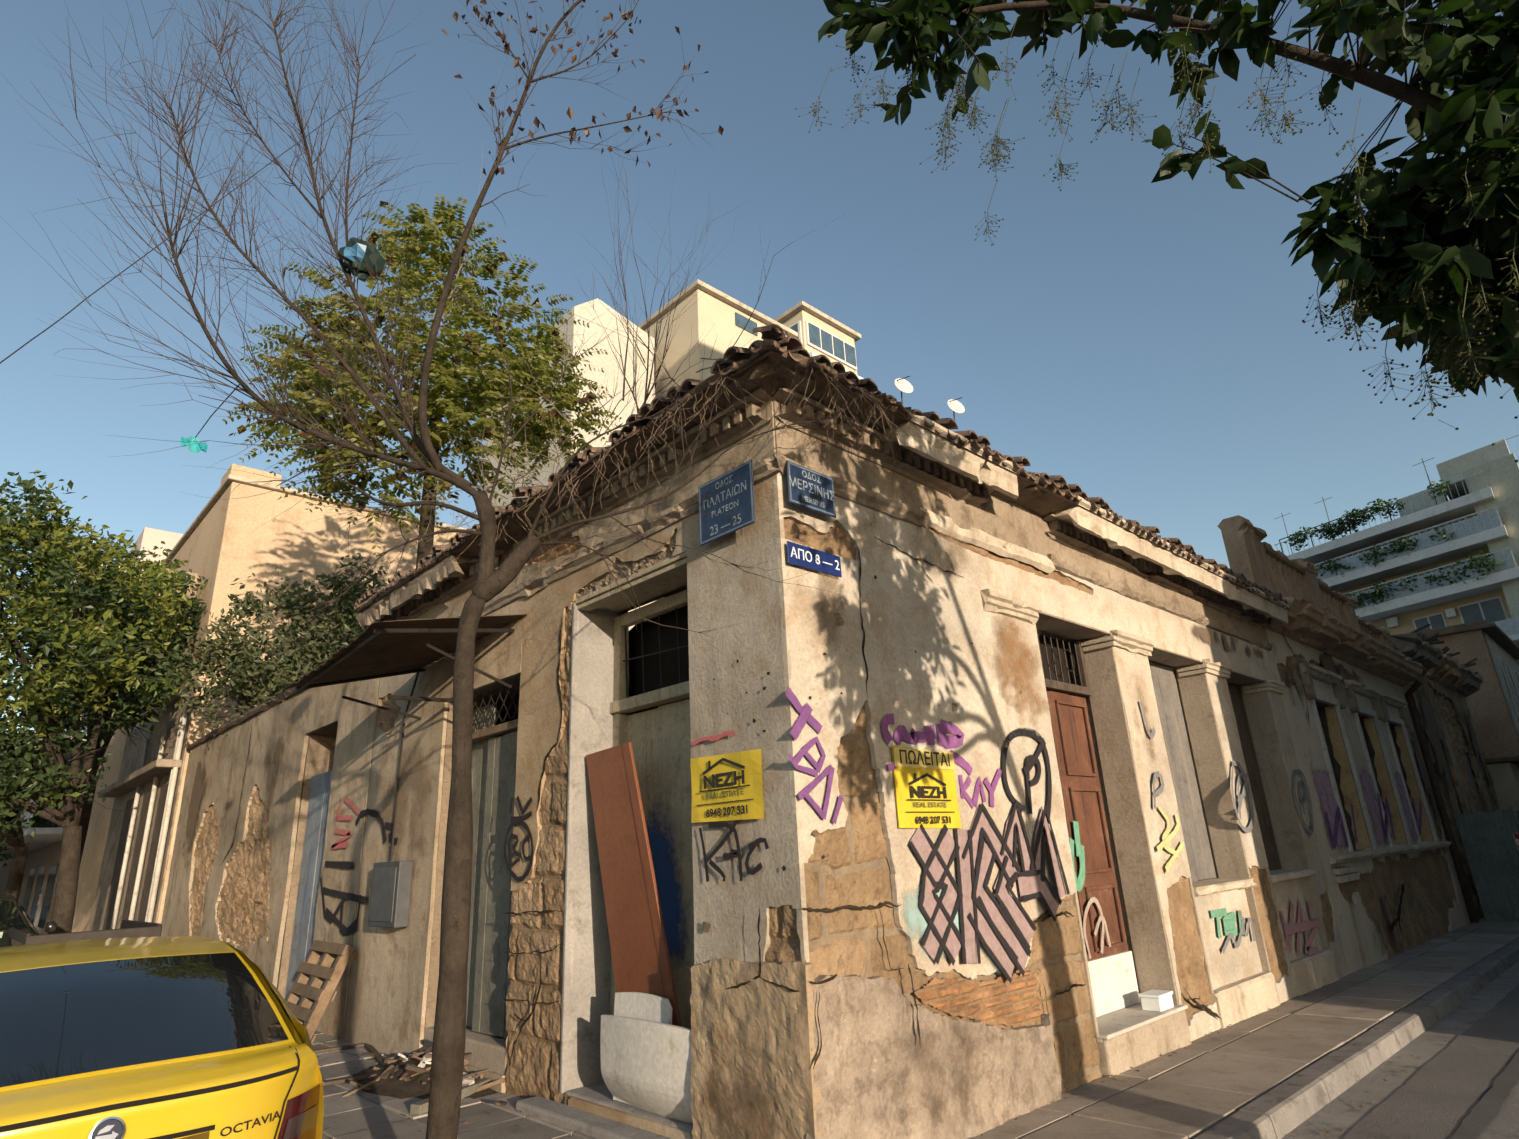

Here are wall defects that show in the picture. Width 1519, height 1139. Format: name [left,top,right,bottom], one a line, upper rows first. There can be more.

spalling [784,518,856,560]
crack [854,537,963,698]
spalling [190,787,271,946]
spalling [494,534,676,1105]
crack [724,909,837,1069]
crack [803,901,923,1043]
spalling [764,703,1102,1094]
spalling [1167,876,1216,1022]
spalling [1249,866,1288,982]